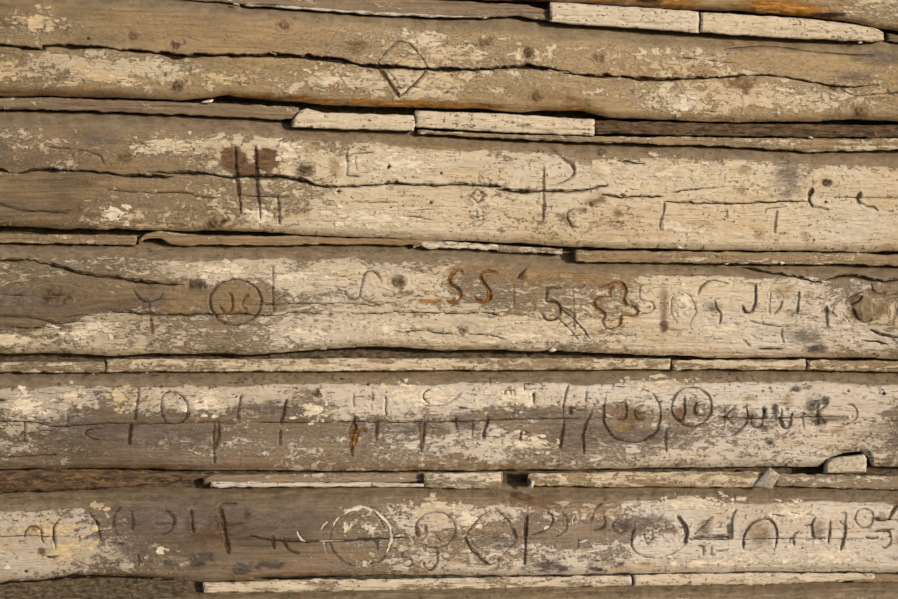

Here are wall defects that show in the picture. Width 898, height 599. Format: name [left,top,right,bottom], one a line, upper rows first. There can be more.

crack [0,45,895,96]
crack [0,145,805,220]
crack [0,259,177,285]
crack [743,267,898,282]
crack [751,321,788,350]
peeling [3,381,86,420]
peeling [177,389,234,418]
peeling [289,398,339,425]
peeling [373,377,561,413]
peeling [492,429,560,455]
peeling [402,492,485,530]
peeling [621,491,747,515]